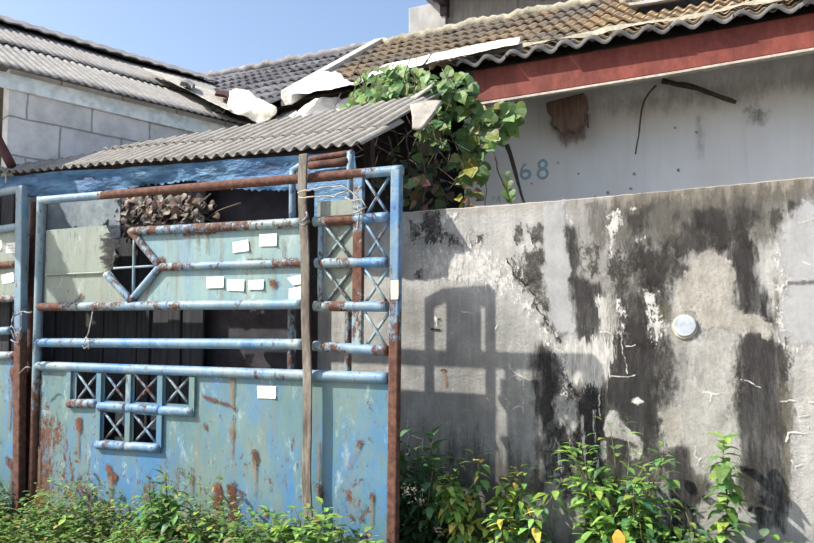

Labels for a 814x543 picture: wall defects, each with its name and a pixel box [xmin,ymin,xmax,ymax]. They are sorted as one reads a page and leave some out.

water stain [405,179,814,543]
spalling [653,250,786,471]
rust [35,448,45,517]
rust [105,464,117,500]
rust [202,378,236,457]
rust [213,482,244,531]
rust [251,449,259,479]
crack [780,399,814,467]